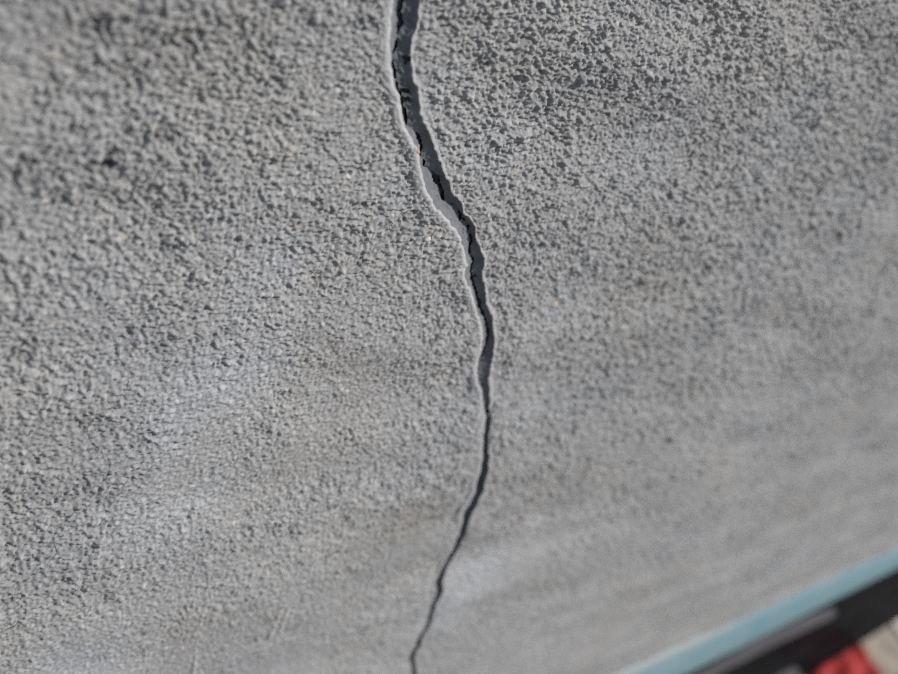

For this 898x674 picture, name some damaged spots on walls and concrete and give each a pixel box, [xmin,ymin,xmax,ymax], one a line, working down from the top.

crack [374,0,498,674]